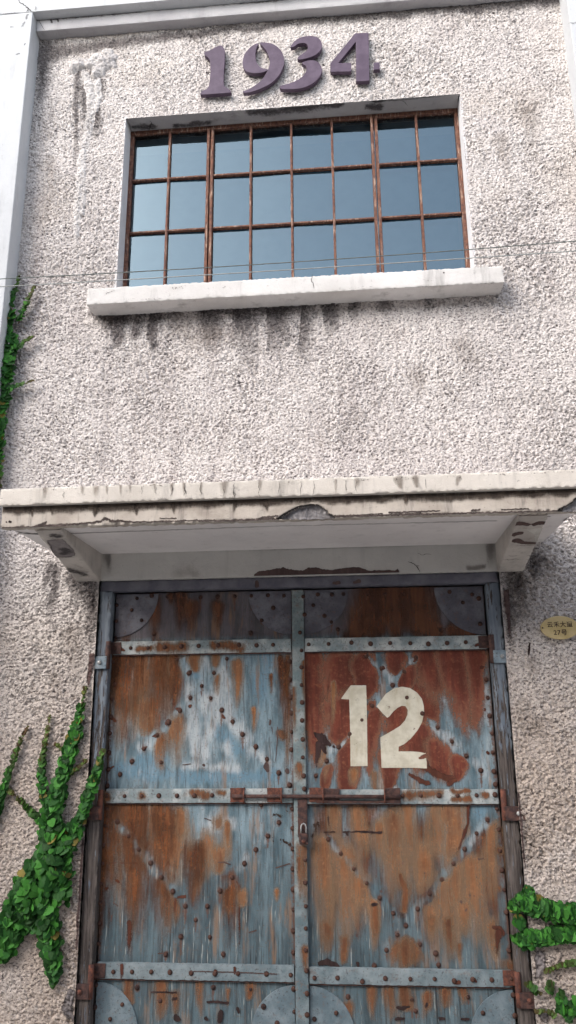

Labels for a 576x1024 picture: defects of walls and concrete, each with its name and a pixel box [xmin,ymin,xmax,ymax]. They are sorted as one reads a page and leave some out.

leakage [37,0,559,98]
leakage [74,72,103,138]
leakage [90,311,179,348]
leakage [200,302,357,341]
peeling [2,498,576,558]
peeling [254,567,399,588]
corrosion [109,592,244,767]
corrosion [263,587,513,970]
corrosion [99,791,257,951]
corrosion [151,981,181,1022]
corrosion [193,966,277,1024]
corrosion [367,978,477,1021]